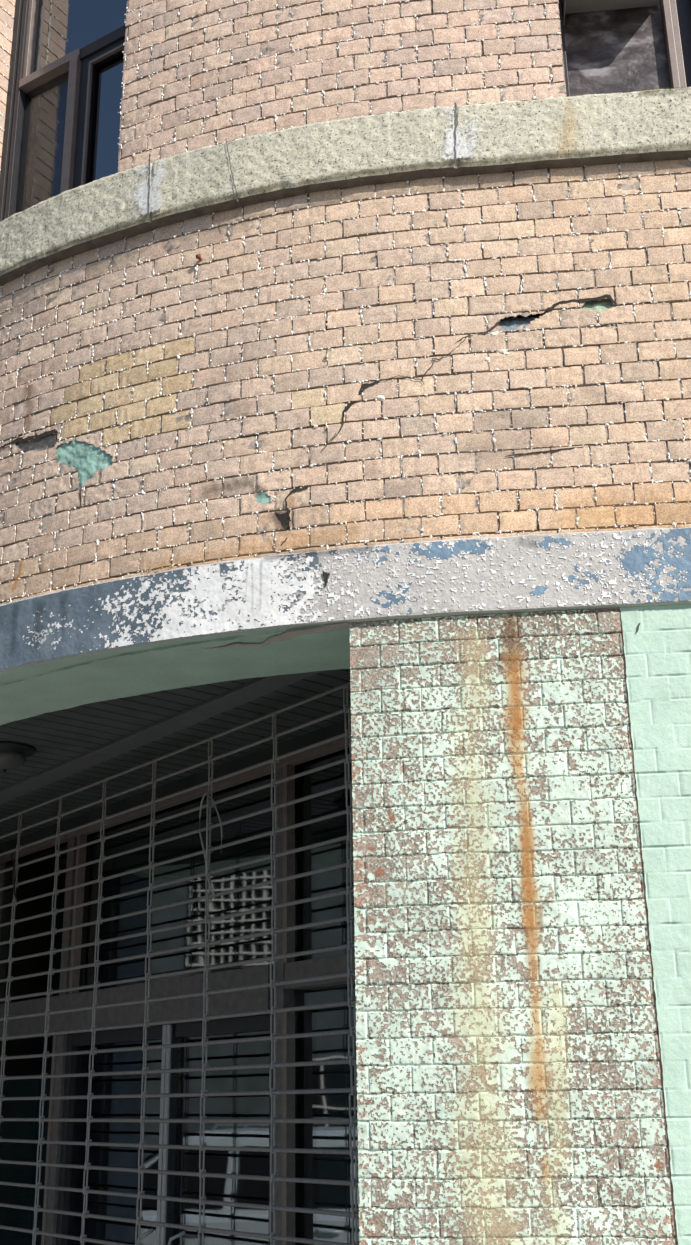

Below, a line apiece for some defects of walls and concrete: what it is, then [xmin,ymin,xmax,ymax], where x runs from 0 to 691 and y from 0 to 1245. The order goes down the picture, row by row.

crack [546,294,617,311]
crack [322,322,499,450]
crack [0,429,58,448]
spalling [16,434,115,491]
spalling [255,491,291,531]
crack [281,487,308,546]
peeling [0,528,691,1245]
rust [507,653,547,1118]